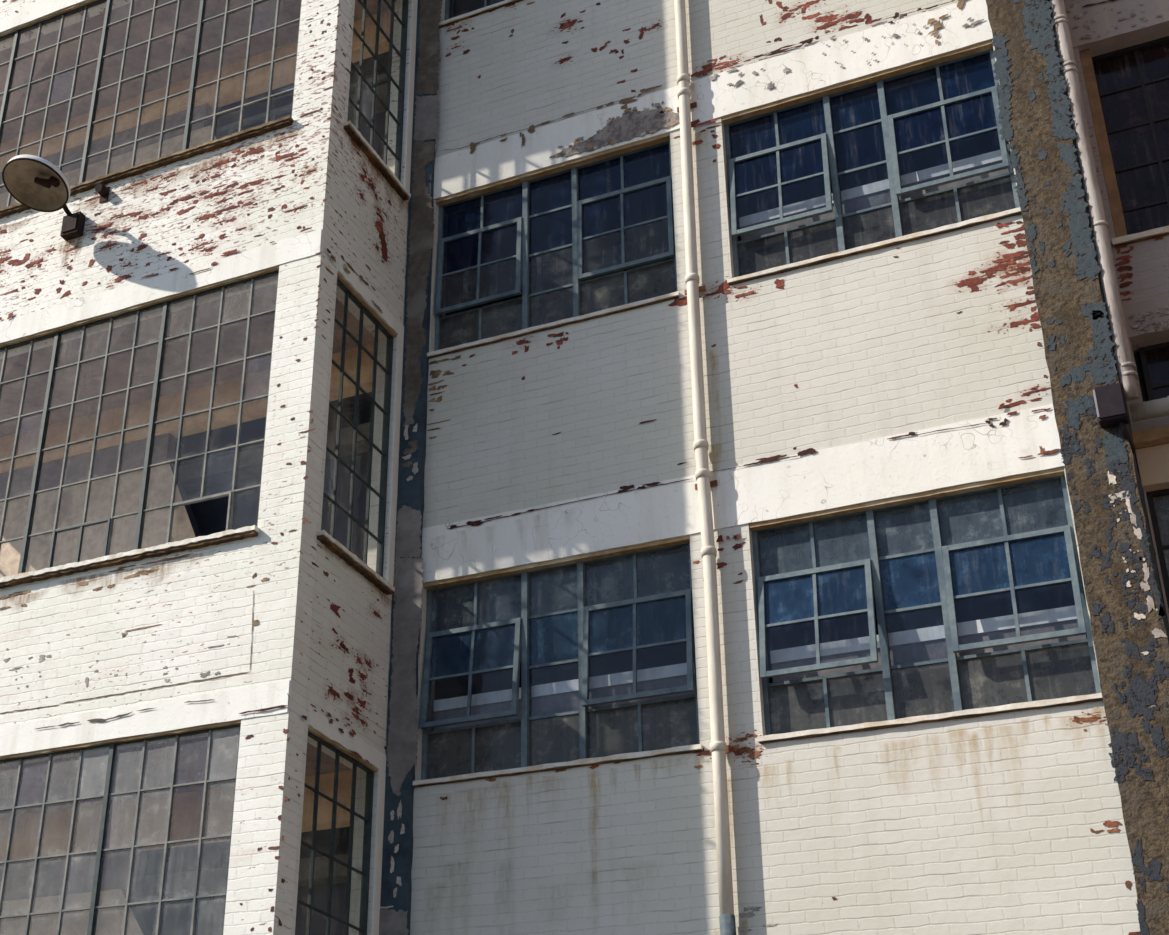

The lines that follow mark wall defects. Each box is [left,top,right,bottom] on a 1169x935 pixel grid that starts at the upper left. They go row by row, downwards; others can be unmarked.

peeling [307,3,352,90]
peeling [591,19,667,59]
peeling [759,0,905,68]
spalling [918,0,984,46]
spalling [550,101,720,163]
peeling [954,0,1163,351]
peeling [0,105,394,341]
peeling [998,302,1169,783]
spalling [301,505,423,935]